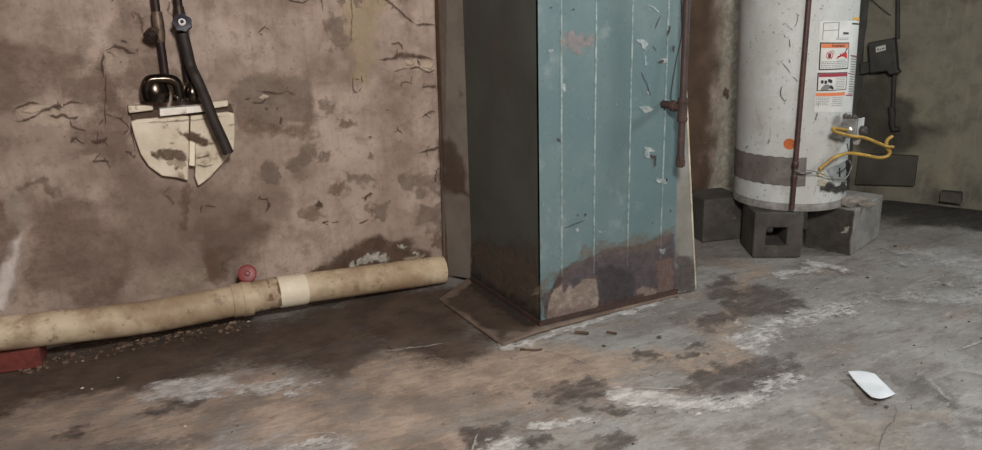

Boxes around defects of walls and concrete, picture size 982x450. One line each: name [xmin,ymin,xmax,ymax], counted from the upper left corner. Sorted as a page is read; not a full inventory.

crack [386,0,434,26]
crack [15,0,144,168]
crack [246,91,293,124]
crack [380,42,436,117]
damp [460,256,866,450]